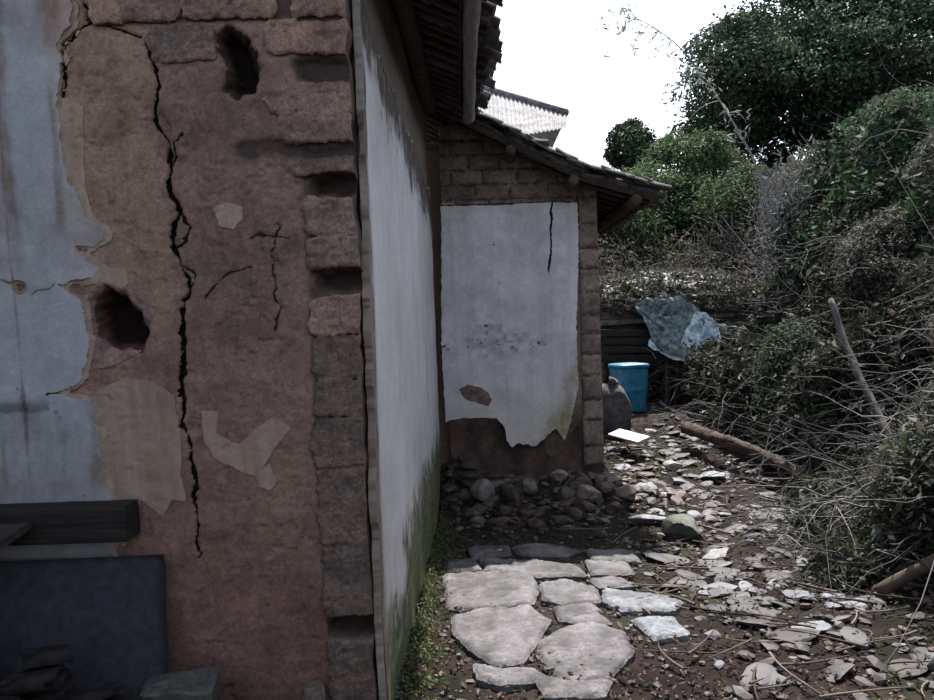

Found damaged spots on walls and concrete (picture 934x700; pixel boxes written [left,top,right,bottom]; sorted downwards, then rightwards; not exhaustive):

crack [546,201,554,273]
crack [62,4,289,558]
flaking render [59,26,375,700]
spalling [459,384,492,406]
spalling [449,418,583,476]